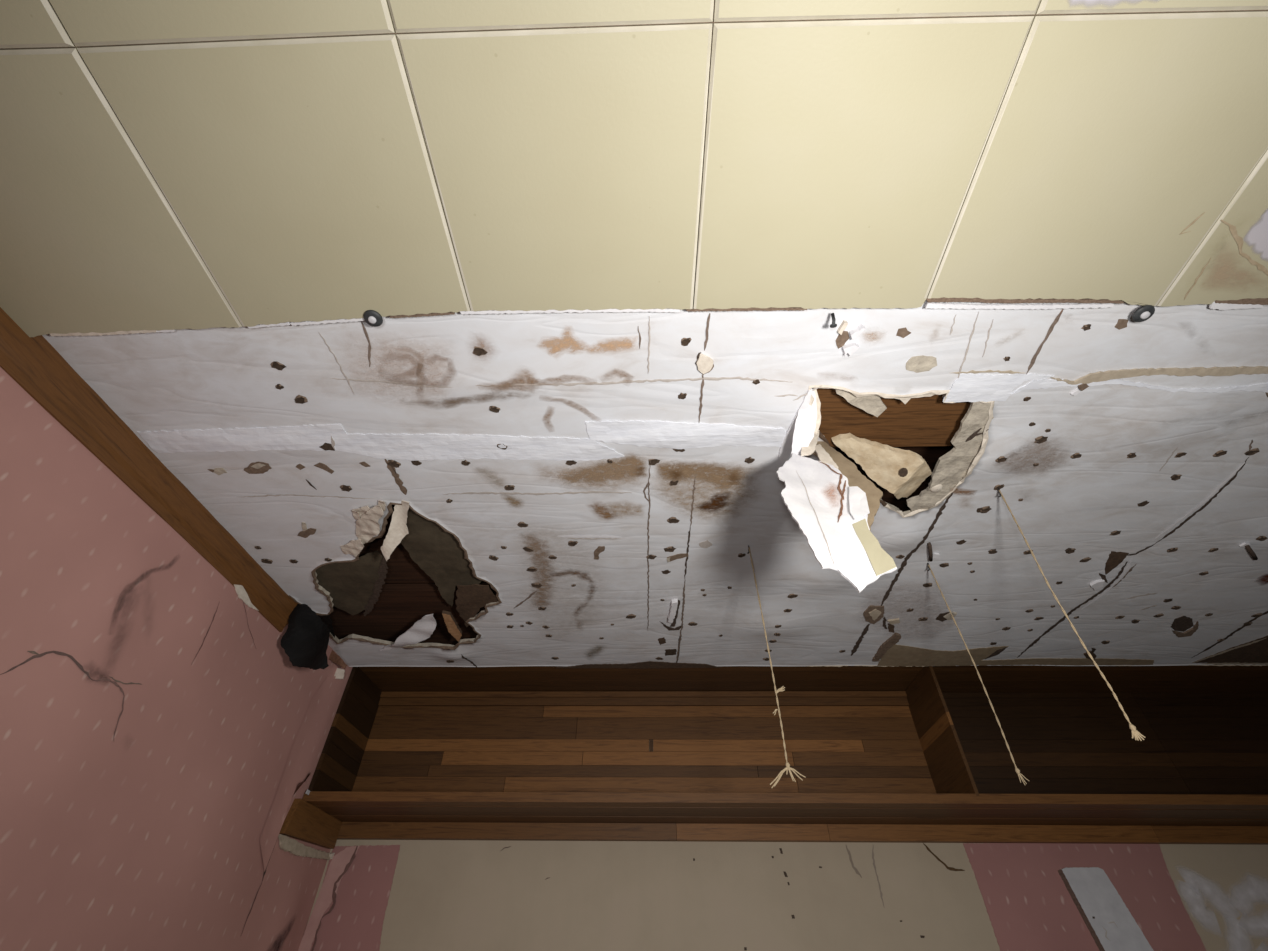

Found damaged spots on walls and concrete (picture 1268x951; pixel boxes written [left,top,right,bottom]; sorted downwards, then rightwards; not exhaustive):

leakage [543,331,632,353]
spalling [835,389,935,417]
leakage [559,457,645,486]
leakage [595,505,640,519]
leakage [659,464,745,512]
spalling [906,402,994,512]
crack [1017,440,1253,658]
crack [851,493,953,656]
crack [1192,611,1268,658]
crack [0,651,142,736]